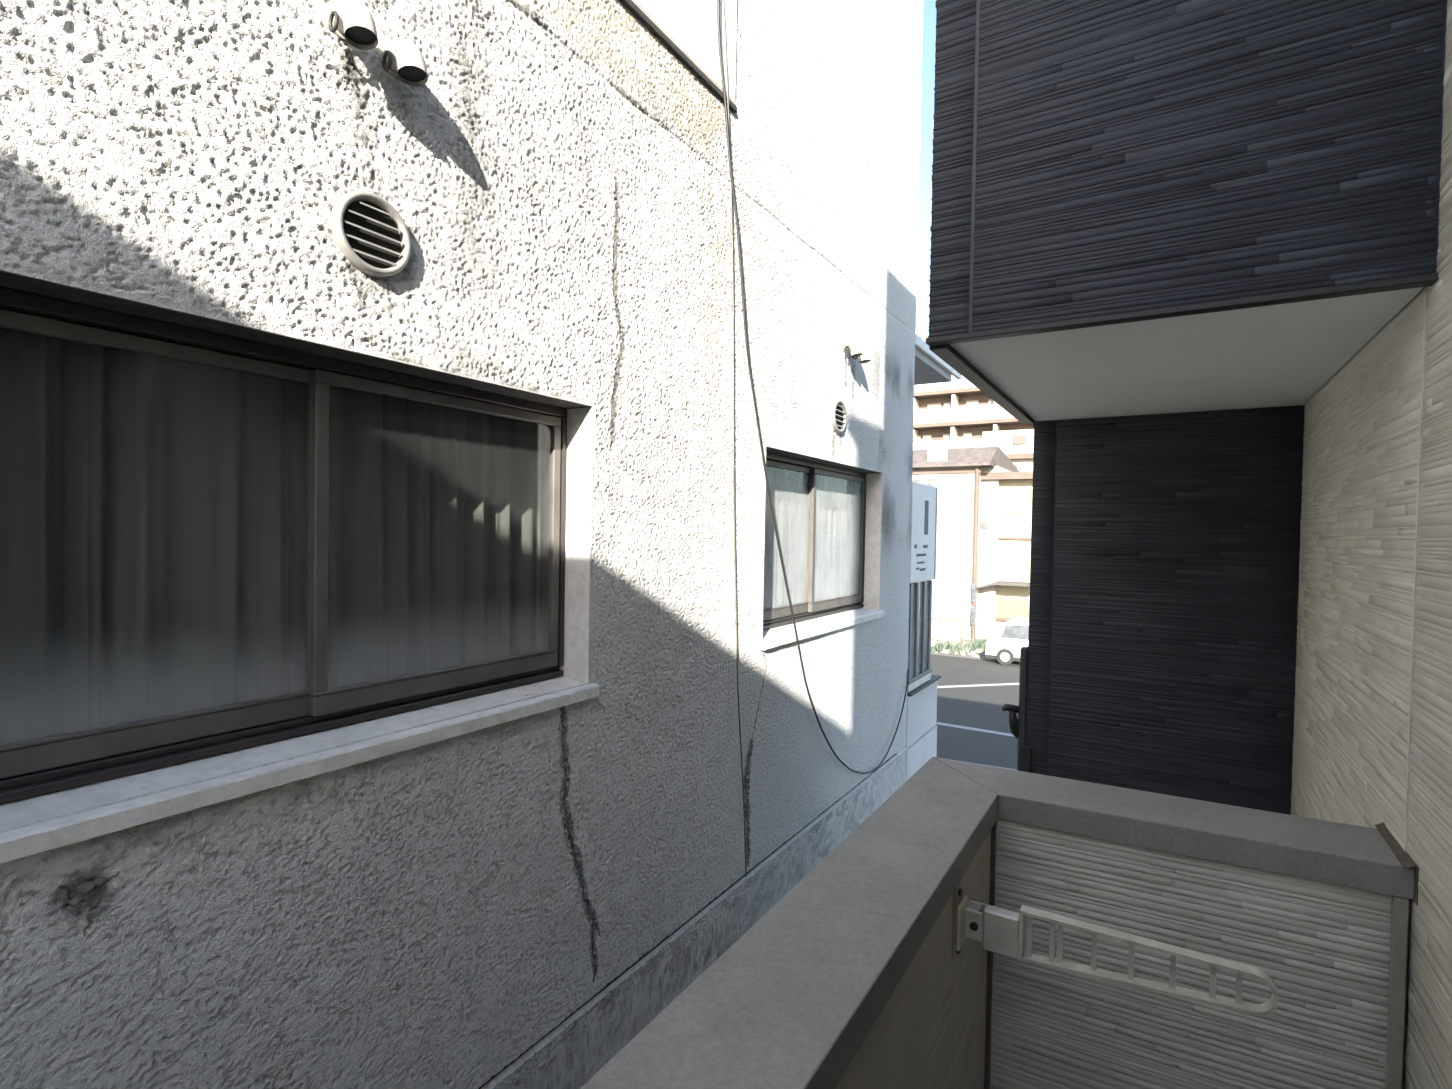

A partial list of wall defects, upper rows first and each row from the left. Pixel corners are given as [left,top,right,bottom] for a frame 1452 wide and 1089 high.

crack [593,178,625,452]
crack [526,693,601,983]
crack [742,650,767,865]